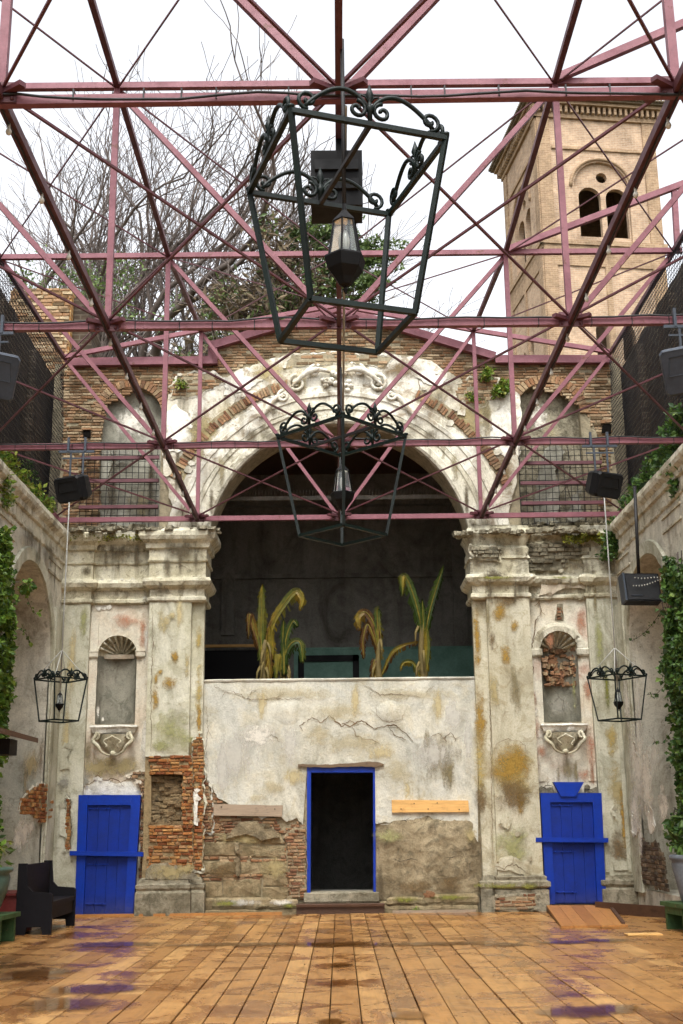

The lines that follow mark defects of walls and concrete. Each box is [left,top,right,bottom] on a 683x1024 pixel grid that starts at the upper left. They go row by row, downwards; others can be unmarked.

spalling [452,445,599,620]
spalling [13,781,75,853]
spalling [84,731,308,900]
crack [205,686,460,758]
water stain [435,676,530,812]
spalling [541,647,576,687]
peeling [613,673,670,892]